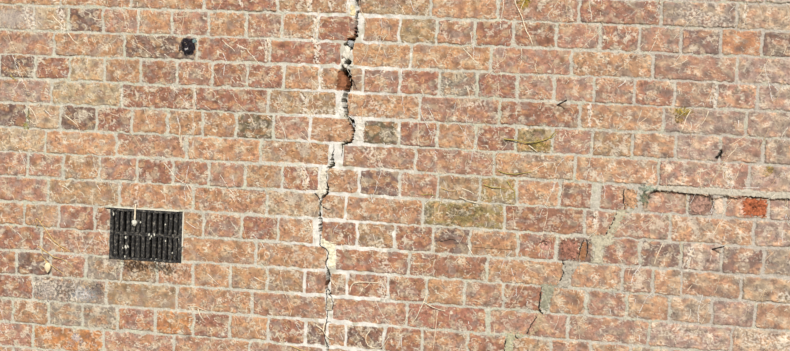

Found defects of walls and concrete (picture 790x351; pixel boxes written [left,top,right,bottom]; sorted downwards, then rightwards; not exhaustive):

crack [349,0,361,16]
crack [314,40,365,214]
crack [319,235,336,269]
crack [503,189,629,351]
crack [324,289,334,345]